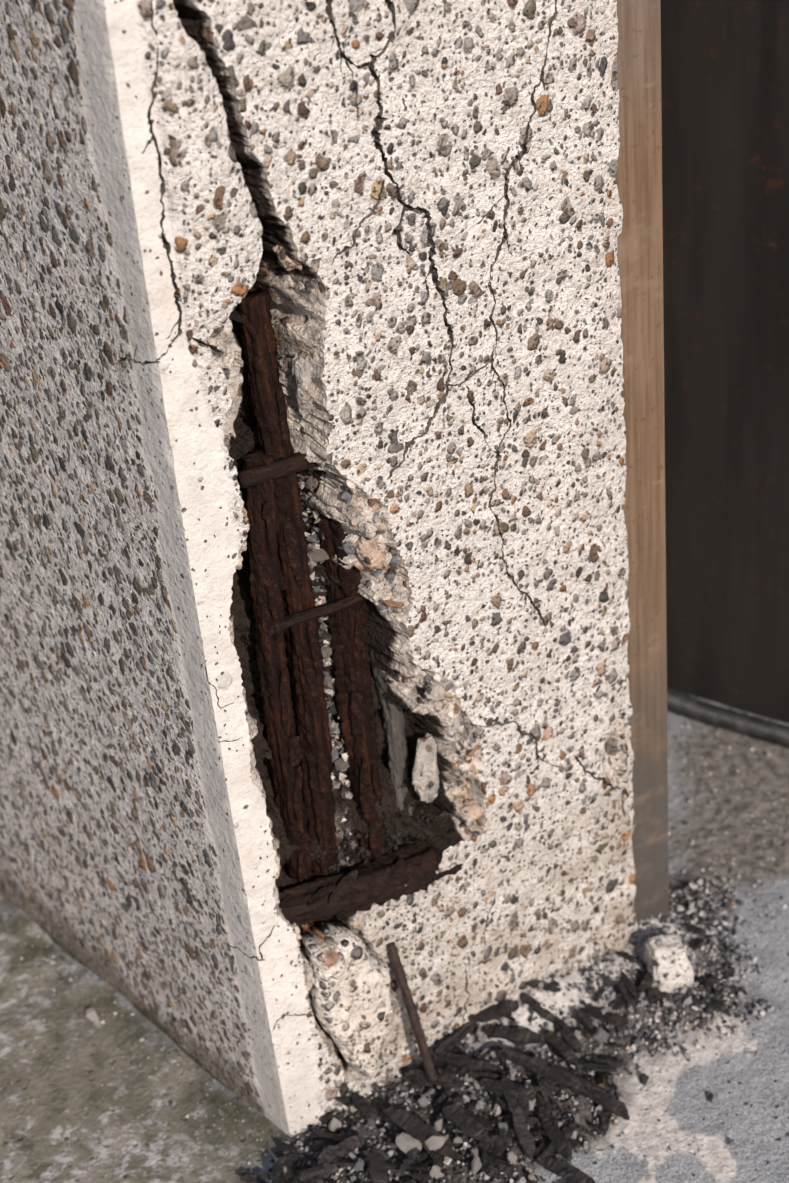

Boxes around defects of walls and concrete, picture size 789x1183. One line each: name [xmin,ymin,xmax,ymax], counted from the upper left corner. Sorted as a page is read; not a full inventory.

crack [99,0,557,631]
spalling [206,245,487,1082]
crack [471,721,629,816]